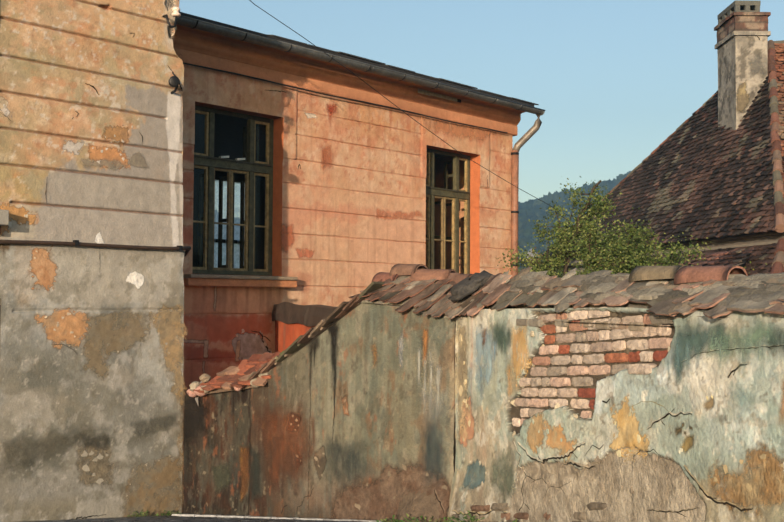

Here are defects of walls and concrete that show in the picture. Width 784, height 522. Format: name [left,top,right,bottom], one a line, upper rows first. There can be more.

flaking render [62,125,133,169]
peeling [29,245,57,291]
flaking render [35,305,190,443]
water stain [672,325,724,380]
crack [681,344,784,378]
water stain [769,330,784,348]
flaking render [331,307,706,522]
crack [638,401,693,430]
water stain [6,432,108,465]
flaking render [123,453,184,517]
crack [634,449,753,517]
flaking render [709,444,784,514]